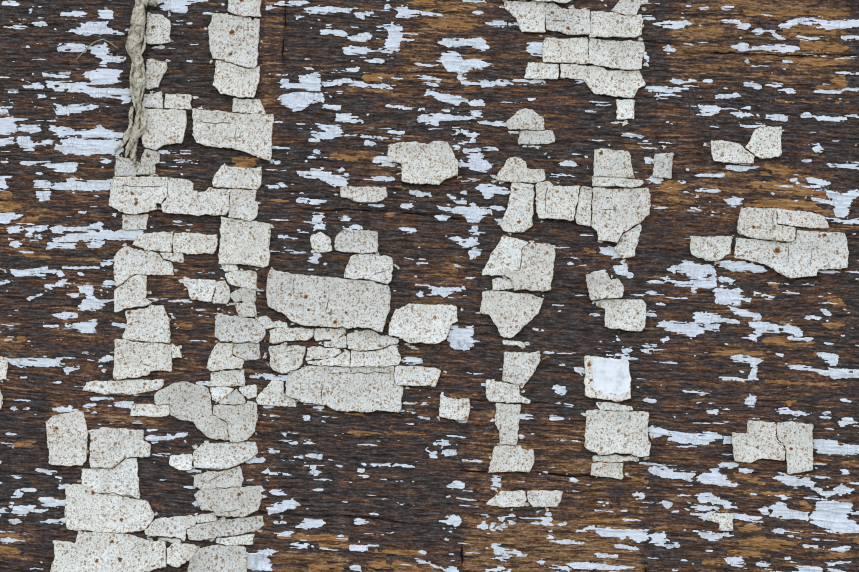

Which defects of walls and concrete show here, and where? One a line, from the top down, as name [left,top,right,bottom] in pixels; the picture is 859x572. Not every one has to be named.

peeling [504,0,648,120]
peeling [782,28,851,104]
peeling [506,108,555,145]
peeling [690,126,849,290]
peeling [0,356,8,409]
peeling [7,0,458,572]
peeling [439,397,470,421]
peeling [480,148,688,484]
peeling [710,334,817,357]
peeling [486,490,563,508]
peeling [732,420,859,509]
peeling [699,513,800,572]